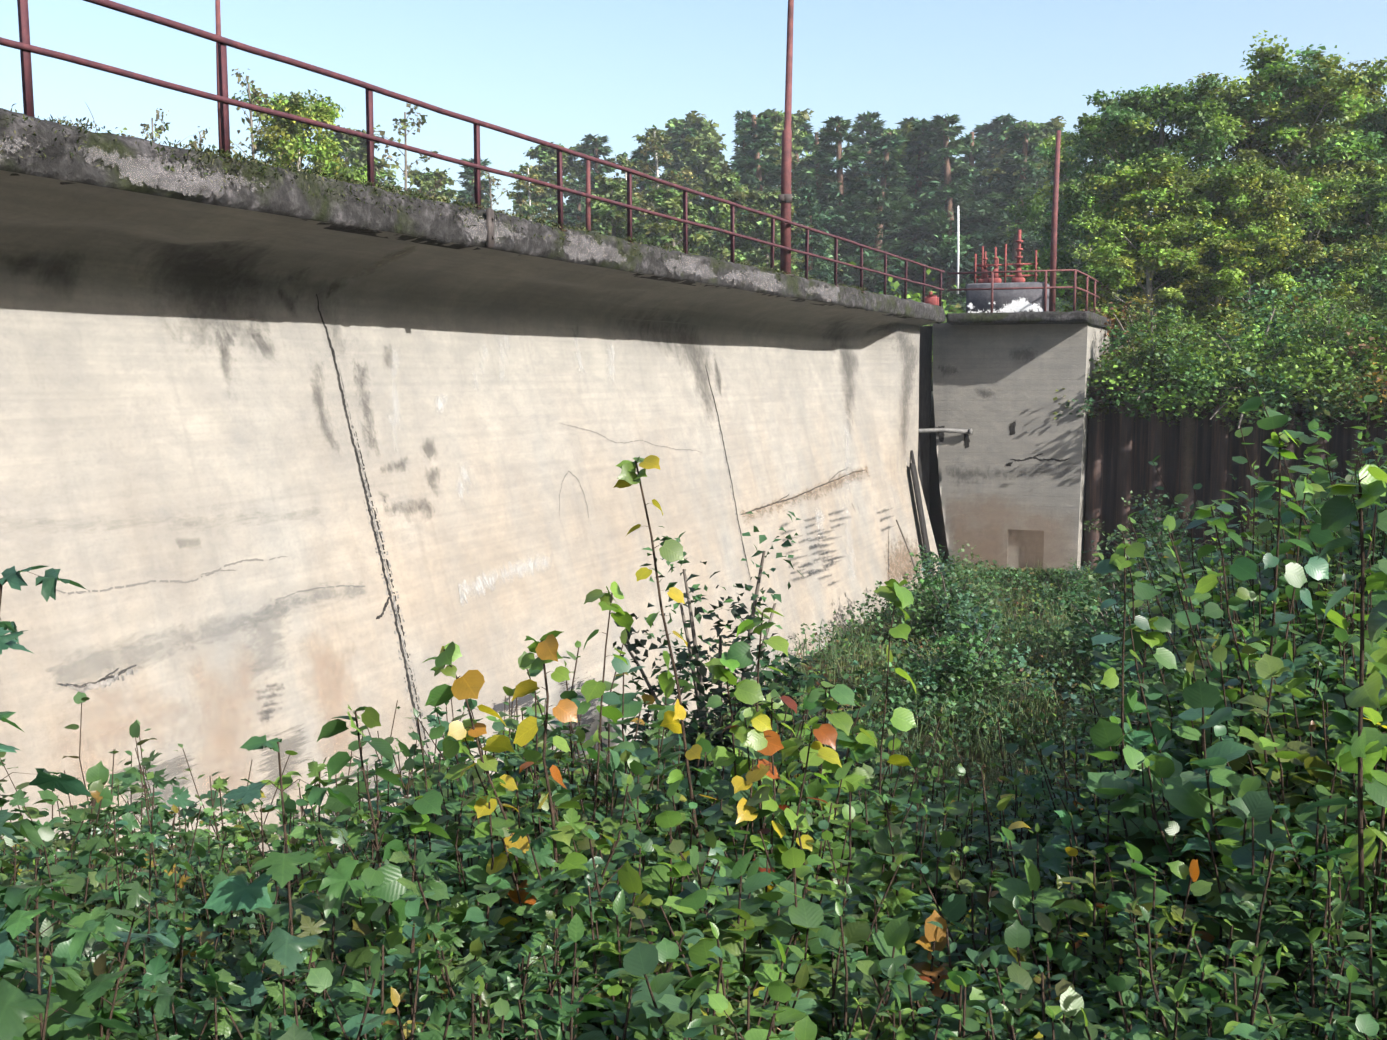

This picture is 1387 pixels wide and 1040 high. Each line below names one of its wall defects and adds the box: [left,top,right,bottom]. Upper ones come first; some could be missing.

crack [559,365,865,581]
crack [1010,453,1070,462]
crack [276,294,433,764]
crack [56,556,287,594]
crack [57,665,138,693]